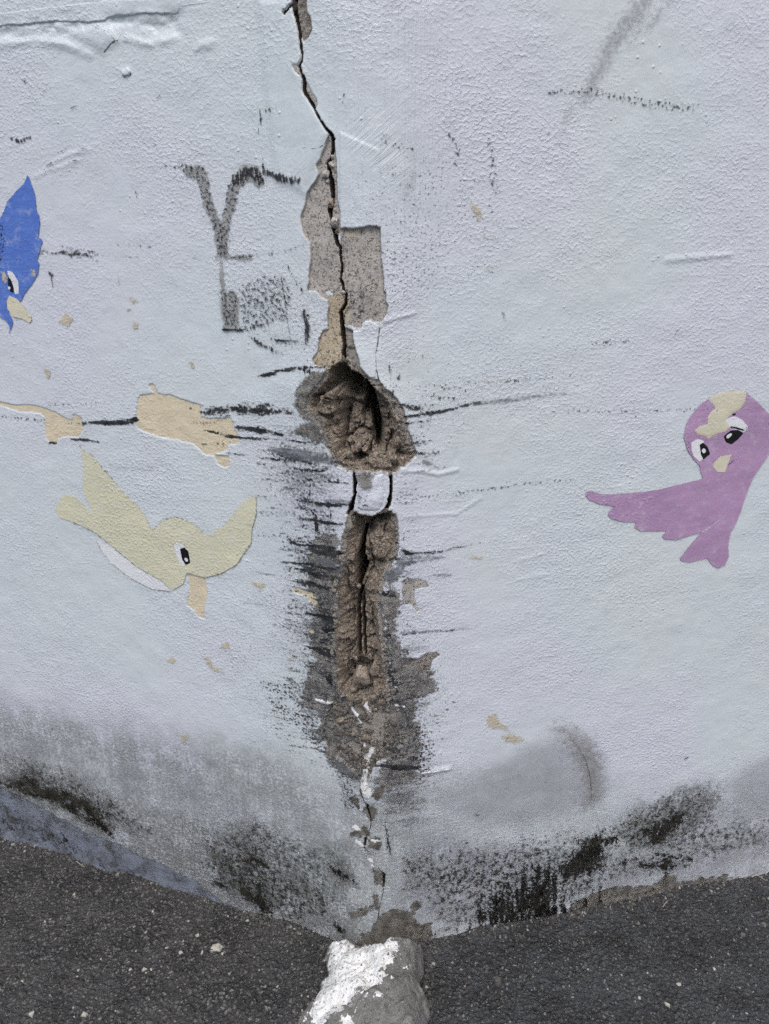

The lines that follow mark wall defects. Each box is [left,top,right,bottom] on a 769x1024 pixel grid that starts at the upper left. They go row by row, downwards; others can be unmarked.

crack [284,0,350,367]
spalling [281,137,416,495]
peeling [136,384,241,467]
leakage [295,478,349,525]
crack [347,464,394,517]
leakage [377,542,459,597]
leakage [260,680,322,749]
spalling [284,508,448,850]
leakage [0,760,181,846]
leakage [201,824,357,939]
crack [360,745,386,924]
leakage [352,790,767,935]